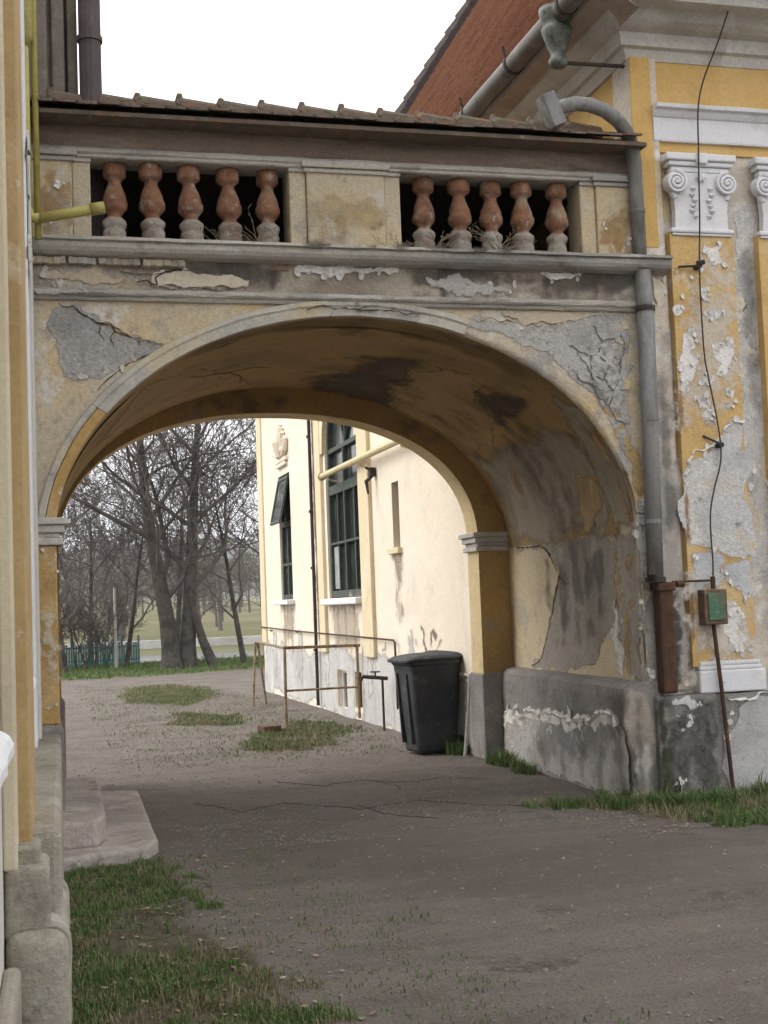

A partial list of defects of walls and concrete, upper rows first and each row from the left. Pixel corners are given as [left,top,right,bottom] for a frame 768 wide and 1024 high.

flaking render [26,136,249,381]
flaking render [270,264,399,281]
peeling [426,273,517,297]
peeling [540,272,582,284]
damp [311,356,419,407]
damp [477,392,526,425]
flaking render [653,206,768,670]
flaking render [467,311,658,681]
spalling [723,692,767,740]
flaking render [502,704,630,796]
crack [197,777,523,819]